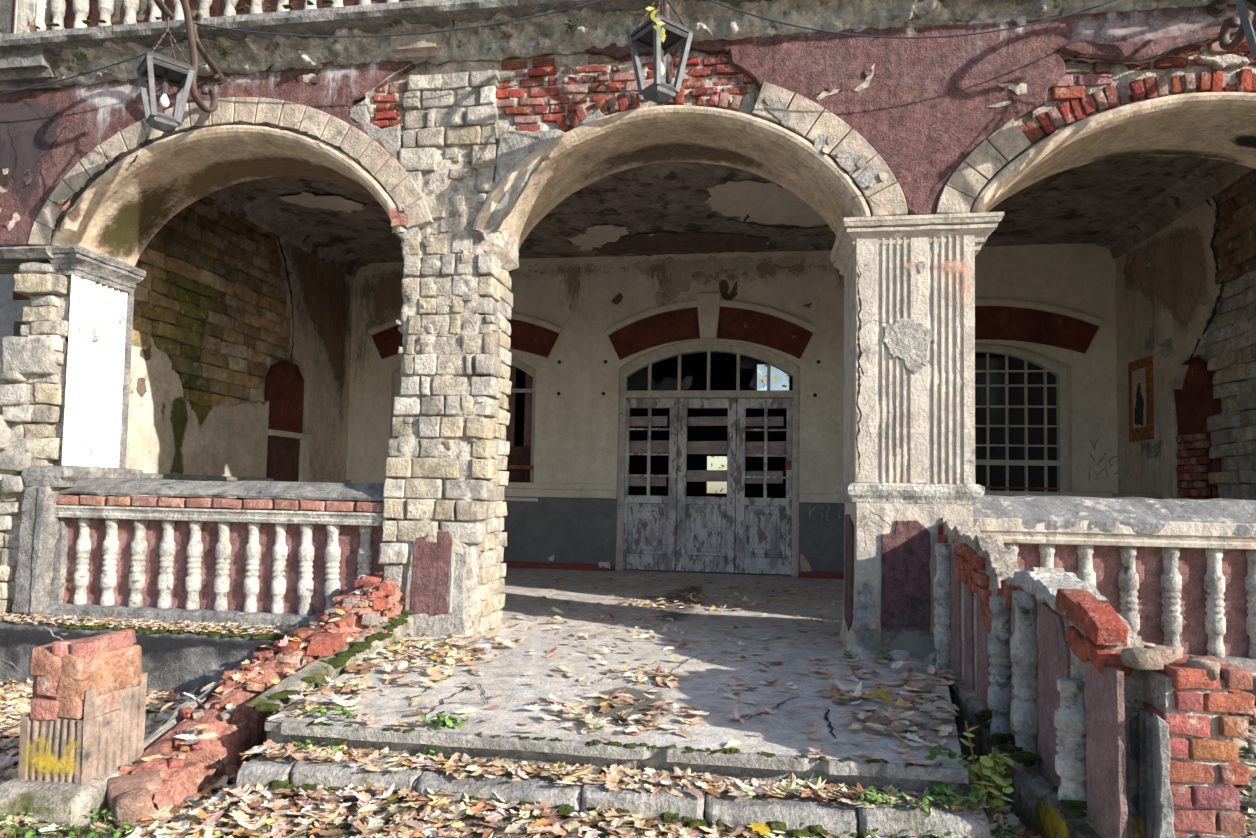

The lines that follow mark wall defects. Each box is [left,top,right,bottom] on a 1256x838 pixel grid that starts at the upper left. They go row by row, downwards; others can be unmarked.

flaking render [369,82,407,129]
flaking render [495,55,654,132]
flaking render [673,56,789,127]
flaking render [1050,62,1112,101]
flaking render [1125,40,1256,71]
spalling [0,142,32,231]
spalling [54,190,74,211]
peeling [278,191,367,213]
peeling [567,180,827,257]
crack [1189,196,1224,364]
peeling [883,318,934,374]
crack [397,681,491,718]